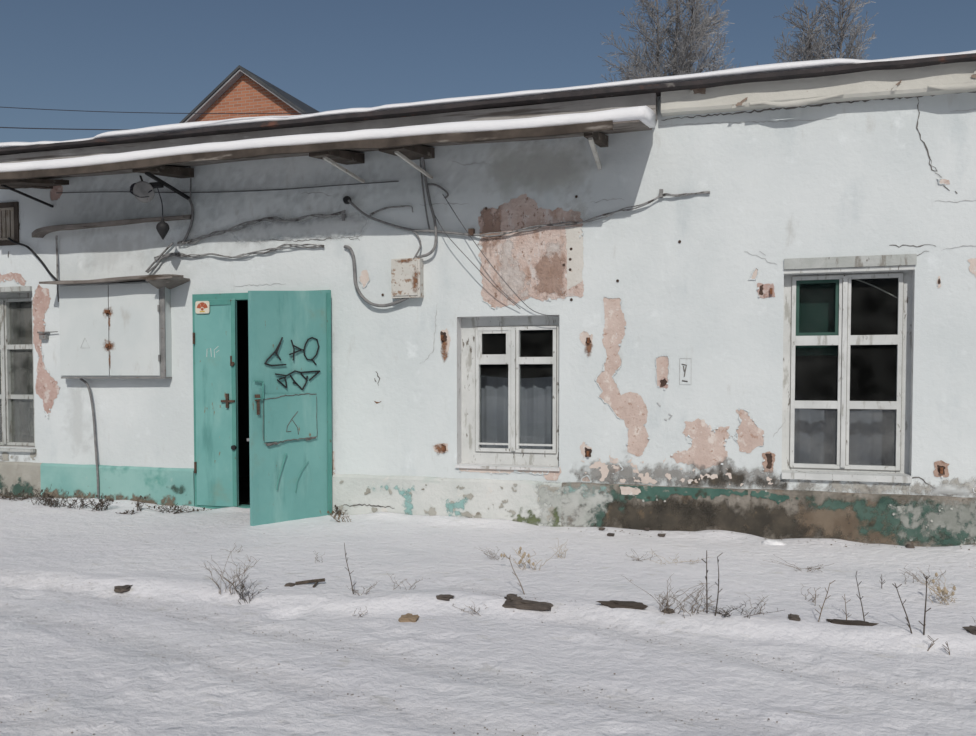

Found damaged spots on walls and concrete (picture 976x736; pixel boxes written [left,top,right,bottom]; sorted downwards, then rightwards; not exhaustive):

peeling [928,71,976,91]
crack [662,91,976,203]
peeling [478,194,584,309]
peeling [0,272,60,420]
peeling [579,297,799,505]
spalling [424,467,561,521]
damp [536,459,976,543]